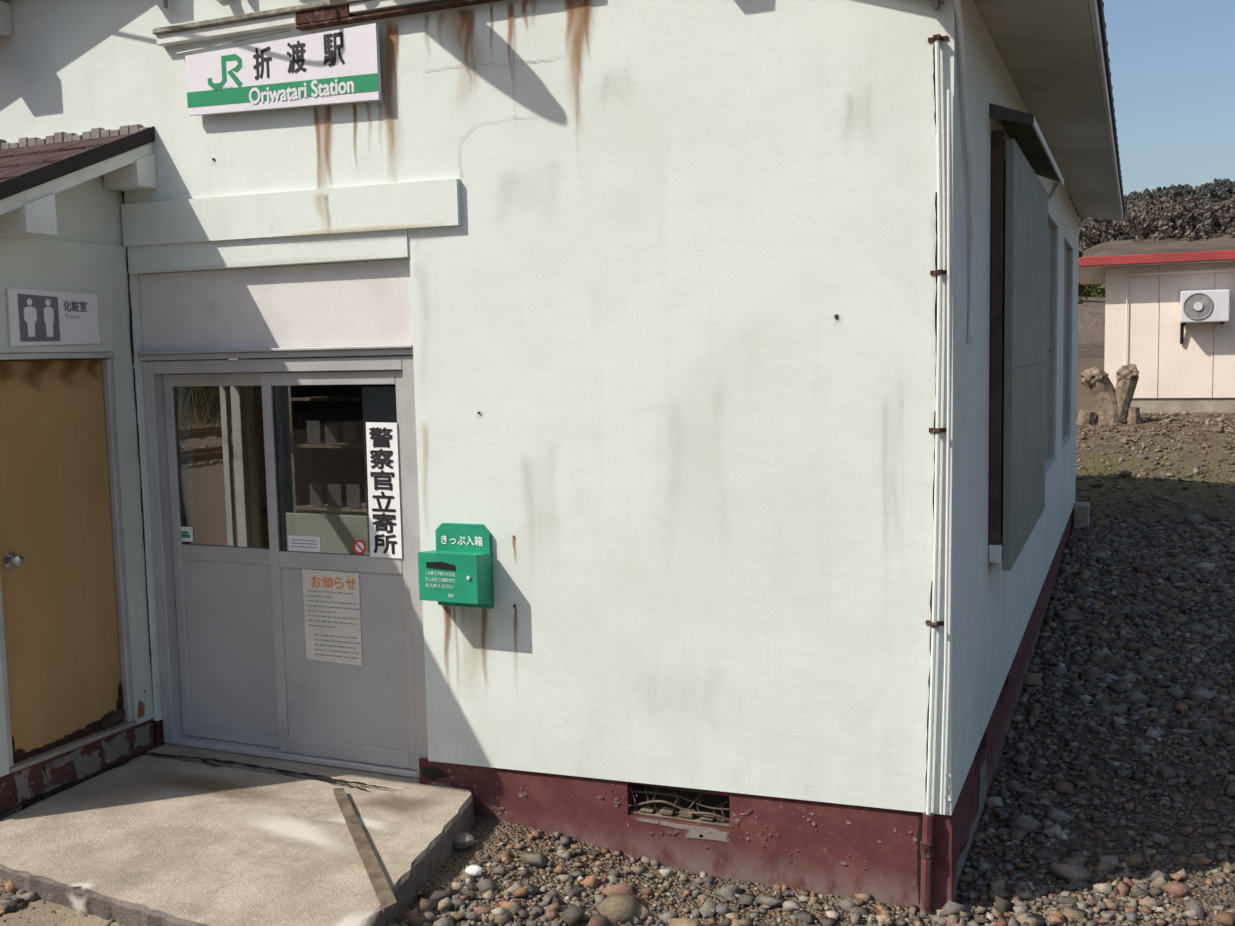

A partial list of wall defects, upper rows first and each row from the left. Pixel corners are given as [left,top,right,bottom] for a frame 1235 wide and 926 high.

rust [296,0,527,105]
rust [565,0,588,44]
rust [314,106,330,172]
rust [444,605,455,655]
peeling [0,709,152,820]